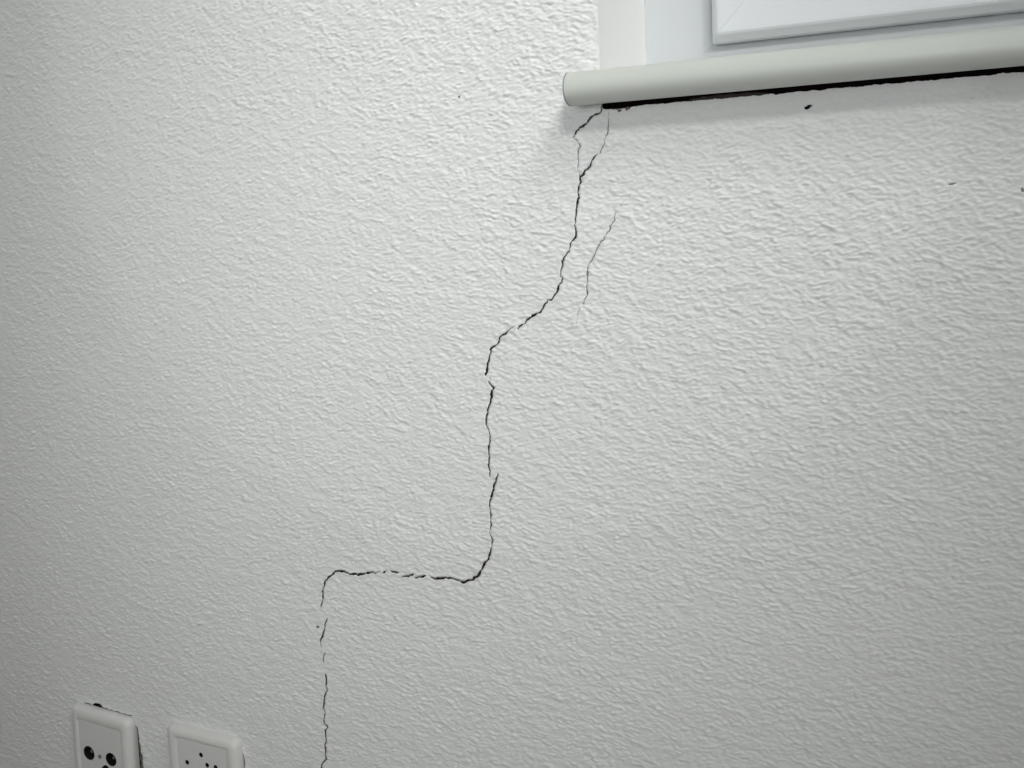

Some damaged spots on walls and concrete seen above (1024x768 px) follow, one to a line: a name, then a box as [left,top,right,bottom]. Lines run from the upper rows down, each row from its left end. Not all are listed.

crack [320,103,622,768]